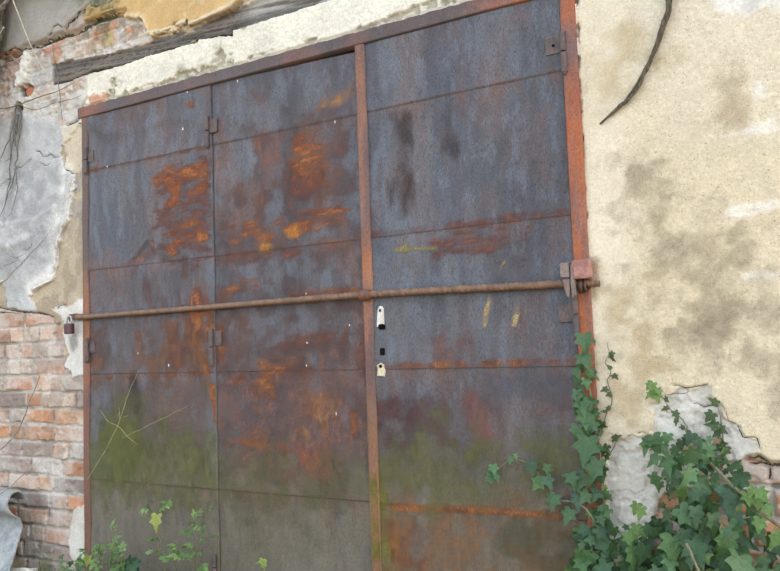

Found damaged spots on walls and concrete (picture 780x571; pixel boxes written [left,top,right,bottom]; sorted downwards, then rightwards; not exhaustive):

flaking render [0,1,234,97]
flaking render [154,20,376,87]
flaking render [441,0,471,9]
rust [130,156,240,269]
rust [284,207,347,237]
flaking render [606,384,780,570]